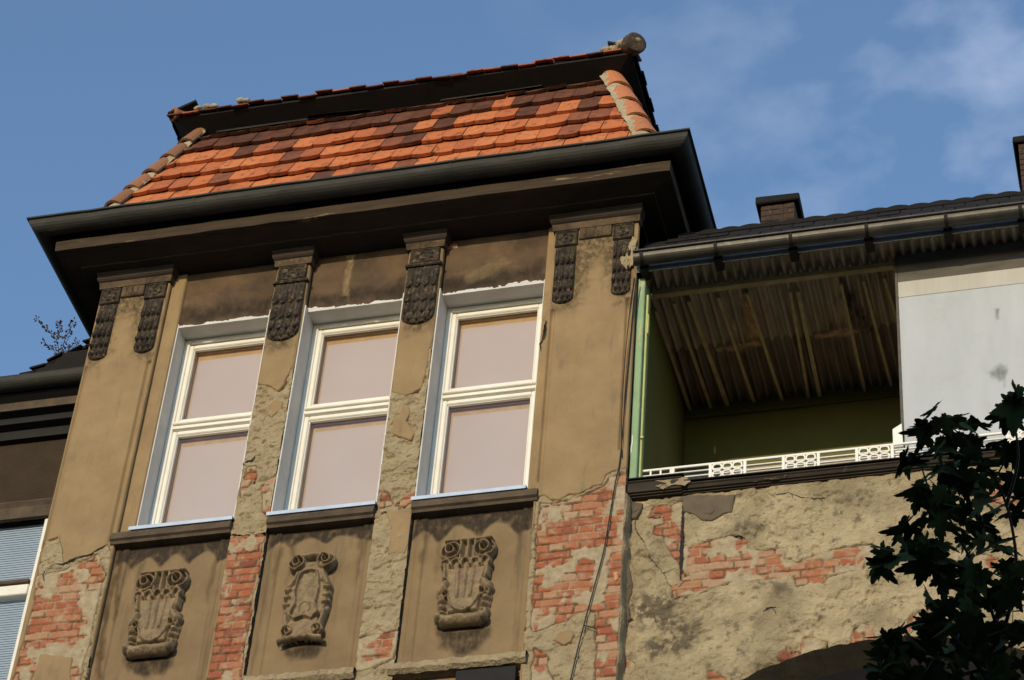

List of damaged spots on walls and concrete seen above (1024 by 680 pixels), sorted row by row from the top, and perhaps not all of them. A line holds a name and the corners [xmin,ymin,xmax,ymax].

flaking render [13,537,111,680]
spalling [208,364,294,680]
spalling [354,344,432,680]
flaking render [522,468,875,680]